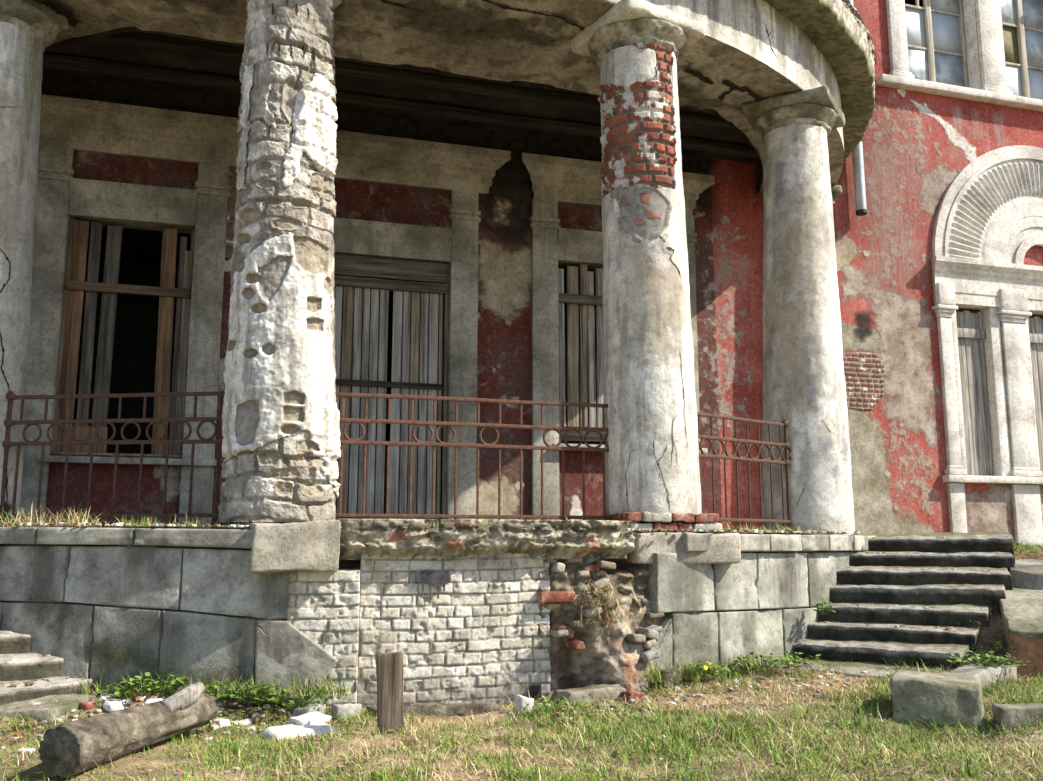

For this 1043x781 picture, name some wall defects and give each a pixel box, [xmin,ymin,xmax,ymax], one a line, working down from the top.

flaking render [598,42,731,260]
crack [682,70,768,102]
crack [0,333,10,393]
crack [0,248,11,293]
peeling [218,64,341,499]
peeling [478,239,532,326]
peeling [695,212,751,435]
peeling [806,89,977,534]